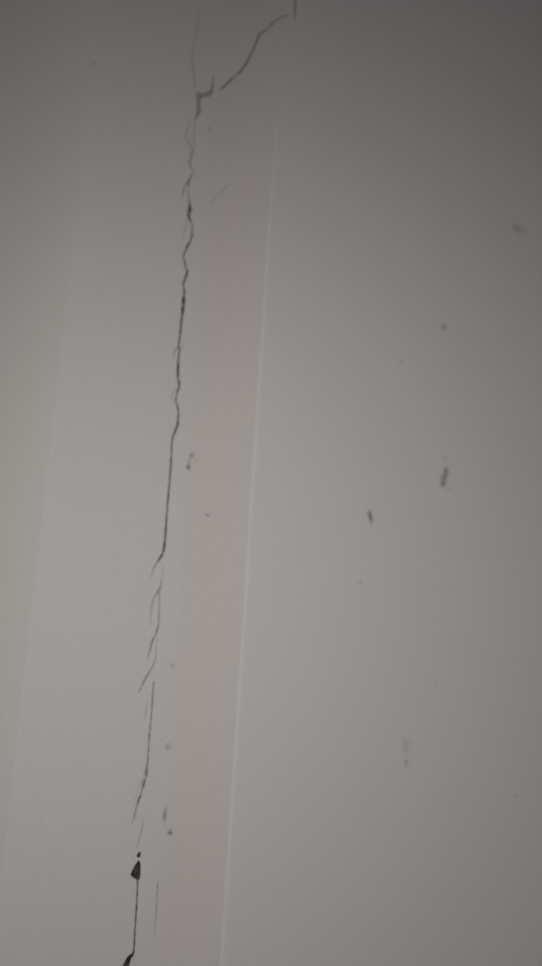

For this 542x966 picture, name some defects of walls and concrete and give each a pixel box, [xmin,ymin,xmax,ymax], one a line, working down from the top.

crack [158,202,193,560]
crack [130,880,138,957]